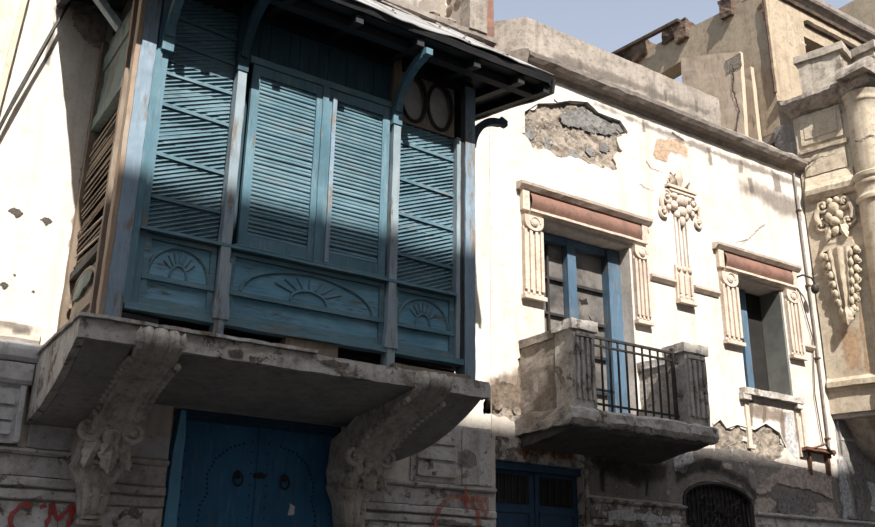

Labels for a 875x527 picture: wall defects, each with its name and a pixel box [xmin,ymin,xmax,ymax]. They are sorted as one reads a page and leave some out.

crack [732,66,740,132]
spalling [522,98,628,170]
peeling [653,138,688,161]
spalling [712,417,838,519]
peeling [607,509,671,523]